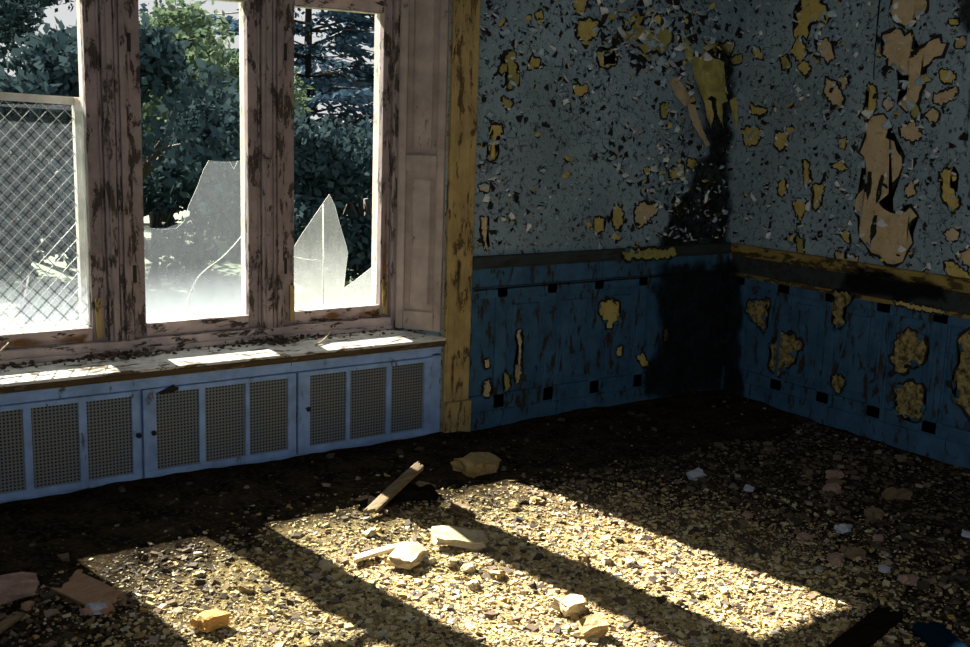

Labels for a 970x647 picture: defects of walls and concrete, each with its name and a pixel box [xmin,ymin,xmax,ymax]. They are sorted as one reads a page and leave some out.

peeling [496,49,542,111]
peeling [572,81,589,98]
peeling [486,121,504,164]
peeling [831,0,967,268]
peeling [479,215,490,253]
peeling [592,199,682,236]
peeling [937,166,970,279]
peeling [597,297,622,330]
peeling [888,326,930,424]
peeling [946,327,970,421]